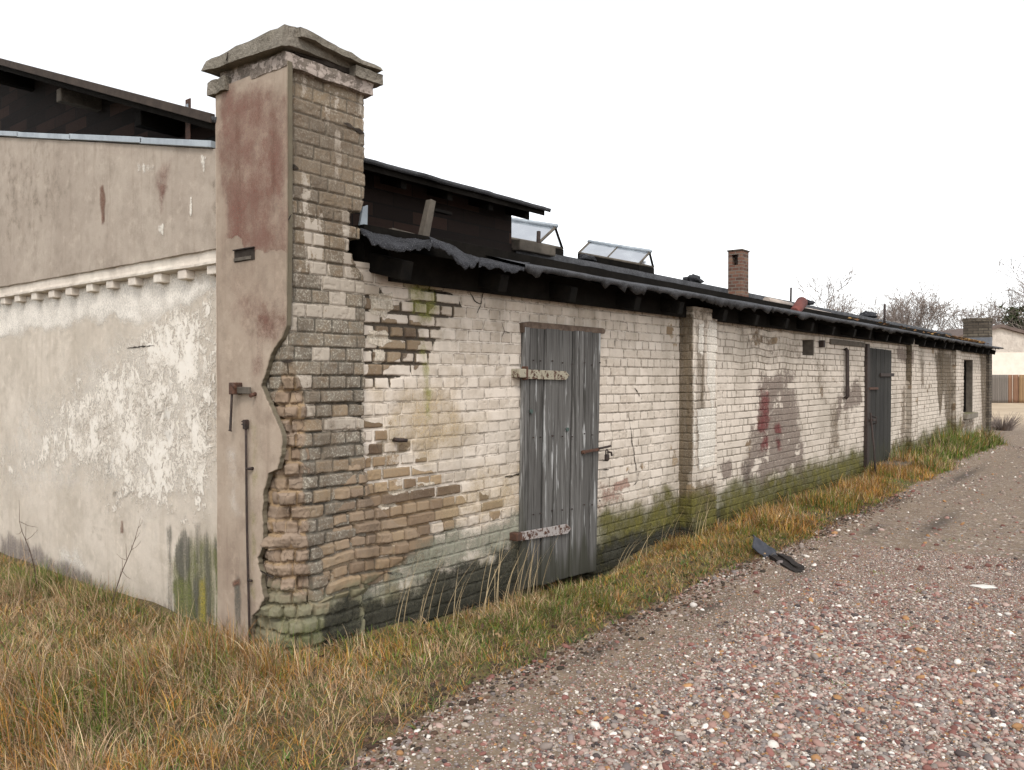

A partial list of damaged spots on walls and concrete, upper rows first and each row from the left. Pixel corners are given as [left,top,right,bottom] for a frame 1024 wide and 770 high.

damp [221,92,283,250]
peeling [364,283,462,389]
peeling [0,282,217,526]
damp [758,392,781,450]
spalling [269,374,310,595]
damp [169,531,218,625]
damp [280,544,524,647]